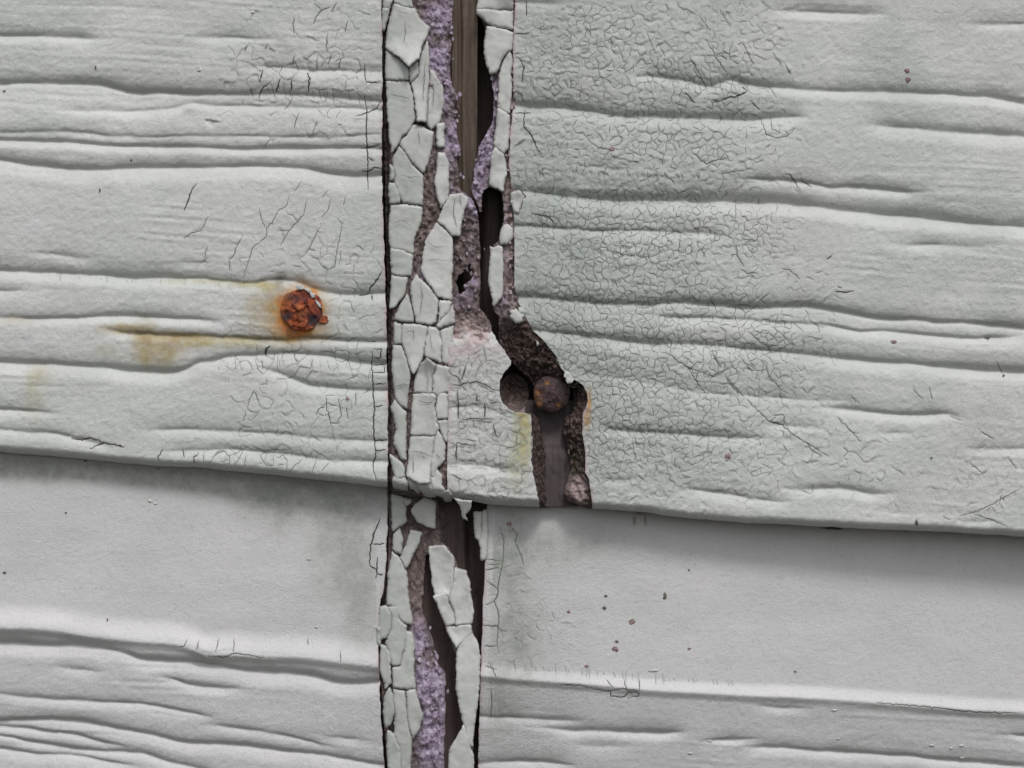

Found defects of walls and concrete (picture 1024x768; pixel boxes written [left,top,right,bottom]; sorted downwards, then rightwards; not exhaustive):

crack [211,3,445,188]
peeling [476,0,523,214]
crack [71,437,124,449]
rust [241,282,315,341]
crack [157,181,528,499]
peeling [376,0,488,768]
peeling [488,224,513,307]
spalling [498,306,592,508]
crack [515,1,905,512]
crack [933,416,1020,526]